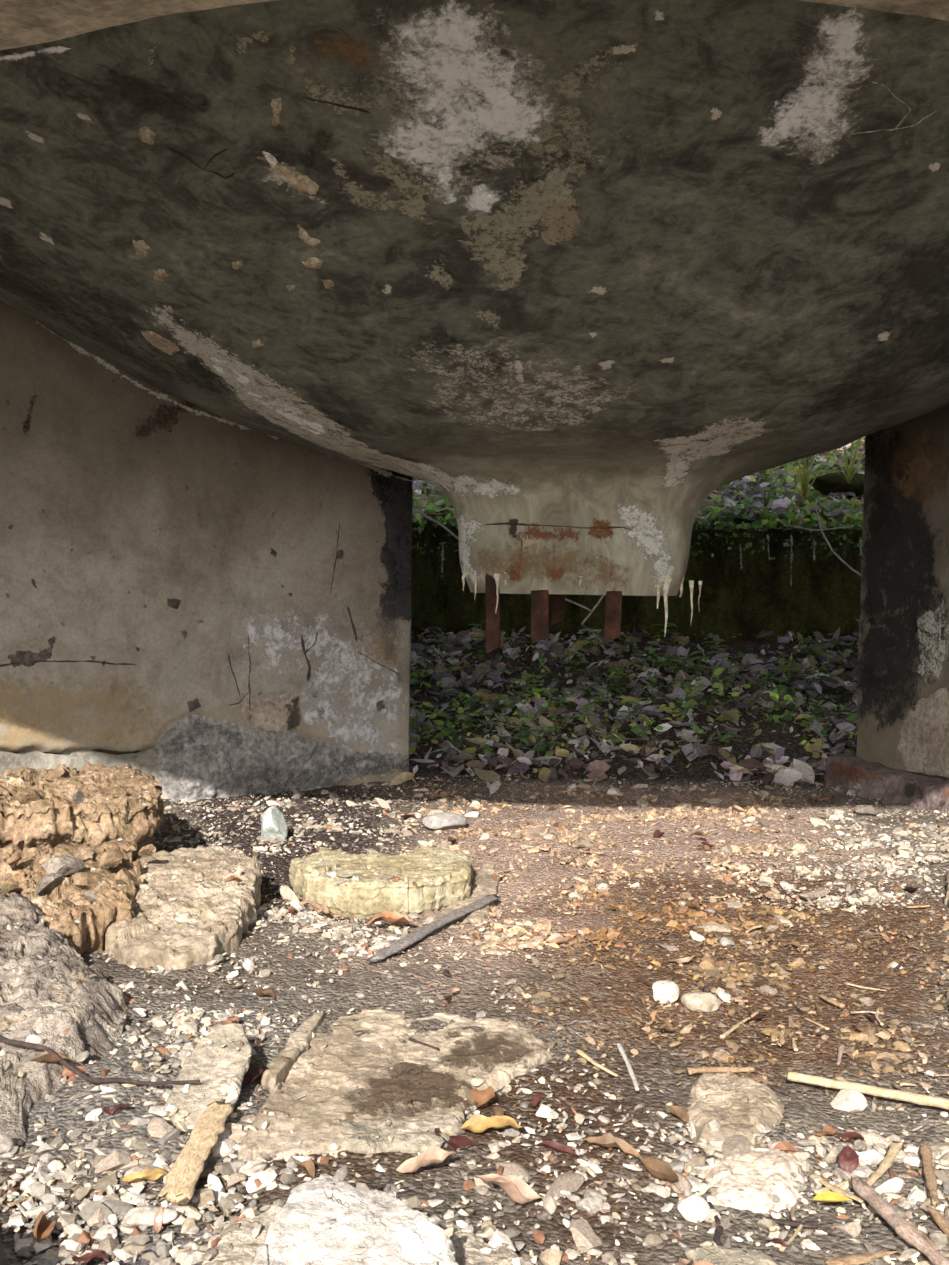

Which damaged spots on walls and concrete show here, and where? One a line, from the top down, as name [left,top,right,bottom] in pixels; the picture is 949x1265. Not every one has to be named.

damp [376,0,552,212]
damp [760,4,873,165]
peeling [329,147,438,225]
peeling [458,43,637,292]
peeling [424,260,456,290]
peeling [471,309,501,329]
damp [146,304,523,660]
damp [441,515,627,591]
rust [509,519,613,581]
damp [857,429,949,731]
crack [0,659,136,667]
peeling [897,687,949,777]